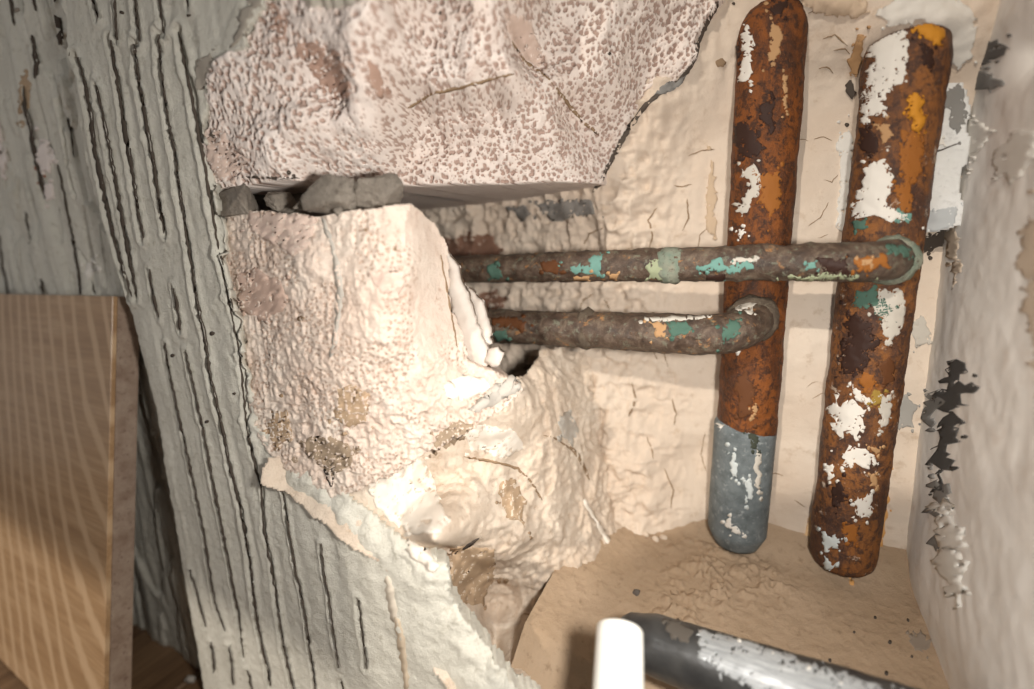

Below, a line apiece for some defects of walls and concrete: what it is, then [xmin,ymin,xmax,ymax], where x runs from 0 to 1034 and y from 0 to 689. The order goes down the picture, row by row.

spalling [229,0,392,102]
crack [408,41,599,136]
rust [911,23,946,72]
rust [733,91,785,232]
rust [891,92,928,221]
spalling [240,211,323,256]
rust [814,253,892,280]
spalling [418,0,1034,689]
rust [834,300,889,408]
spalling [277,436,361,476]
crack [464,456,542,500]
crack [543,435,590,481]